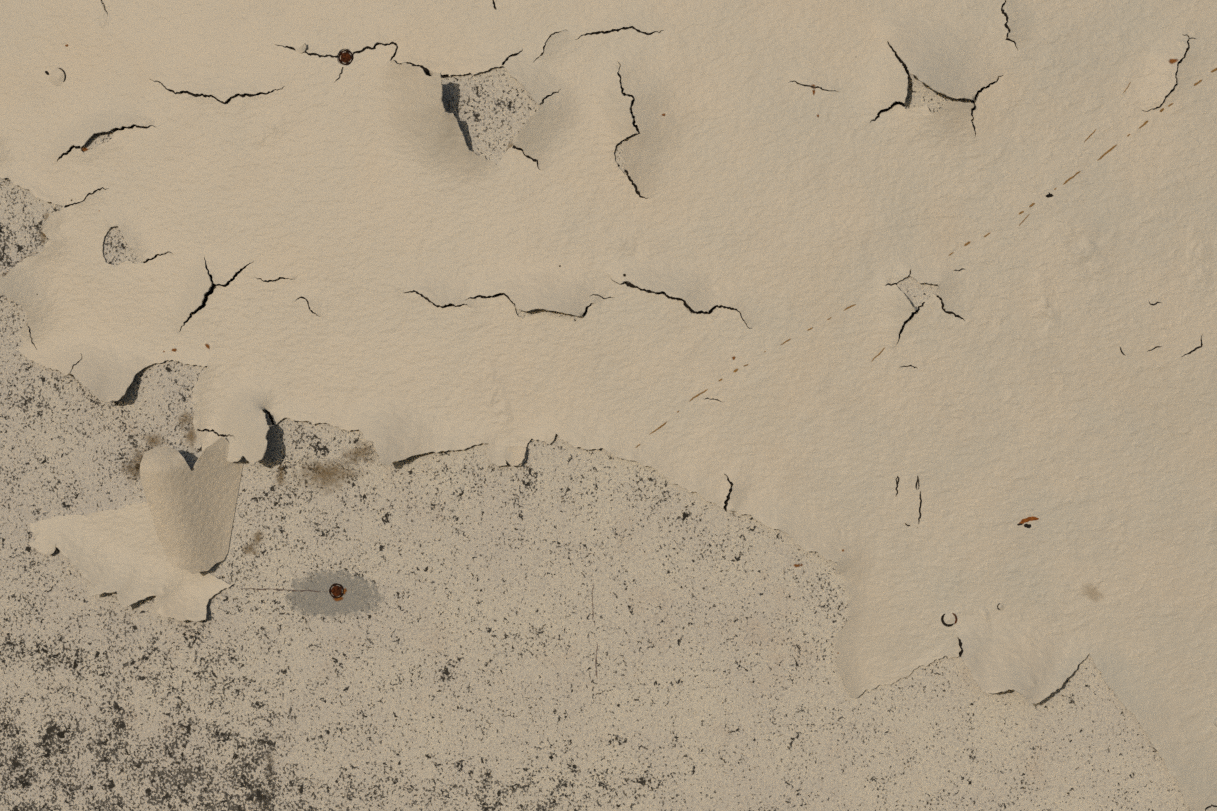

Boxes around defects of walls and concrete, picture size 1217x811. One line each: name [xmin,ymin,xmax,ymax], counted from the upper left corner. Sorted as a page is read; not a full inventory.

crack [47,31,398,215]
peeling [376,43,580,185]
crack [533,12,680,205]
peeling [0,124,222,452]
crack [168,251,324,333]
crack [395,255,757,329]
peeling [874,257,966,351]
rust [329,583,347,601]
peeling [0,294,1217,811]